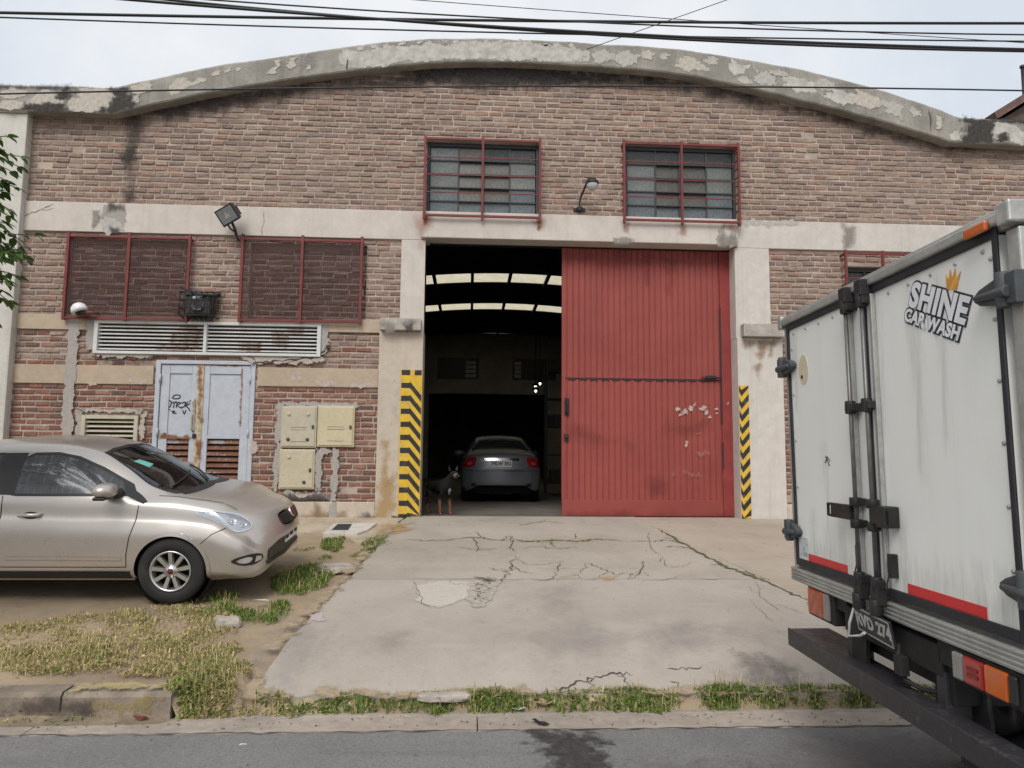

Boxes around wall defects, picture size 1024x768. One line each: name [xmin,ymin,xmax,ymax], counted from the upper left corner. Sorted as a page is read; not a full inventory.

peeling [0,86,116,113]
peeling [130,81,153,103]
peeling [168,66,241,96]
peeling [337,38,966,141]
leakage [99,68,757,169]
leakage [931,116,1024,150]
peeling [991,122,1024,146]
peeling [92,203,127,235]
peeling [675,402,729,418]
crack [405,521,808,621]
spalling [414,578,502,608]
crack [550,671,630,695]